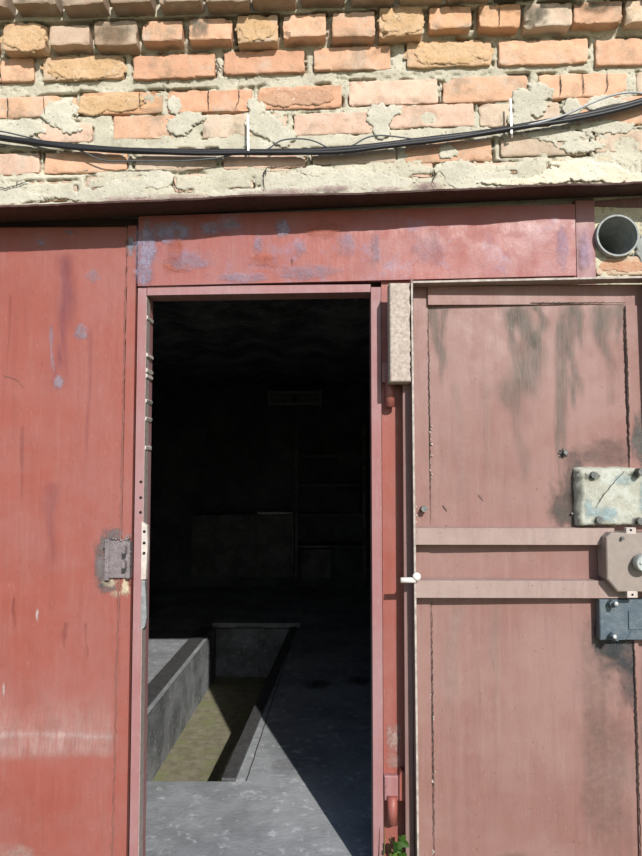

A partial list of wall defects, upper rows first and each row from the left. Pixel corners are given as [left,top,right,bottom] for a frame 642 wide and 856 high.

flaking render [477,158,642,186]
peeling [128,222,188,285]
spalling [599,259,642,273]